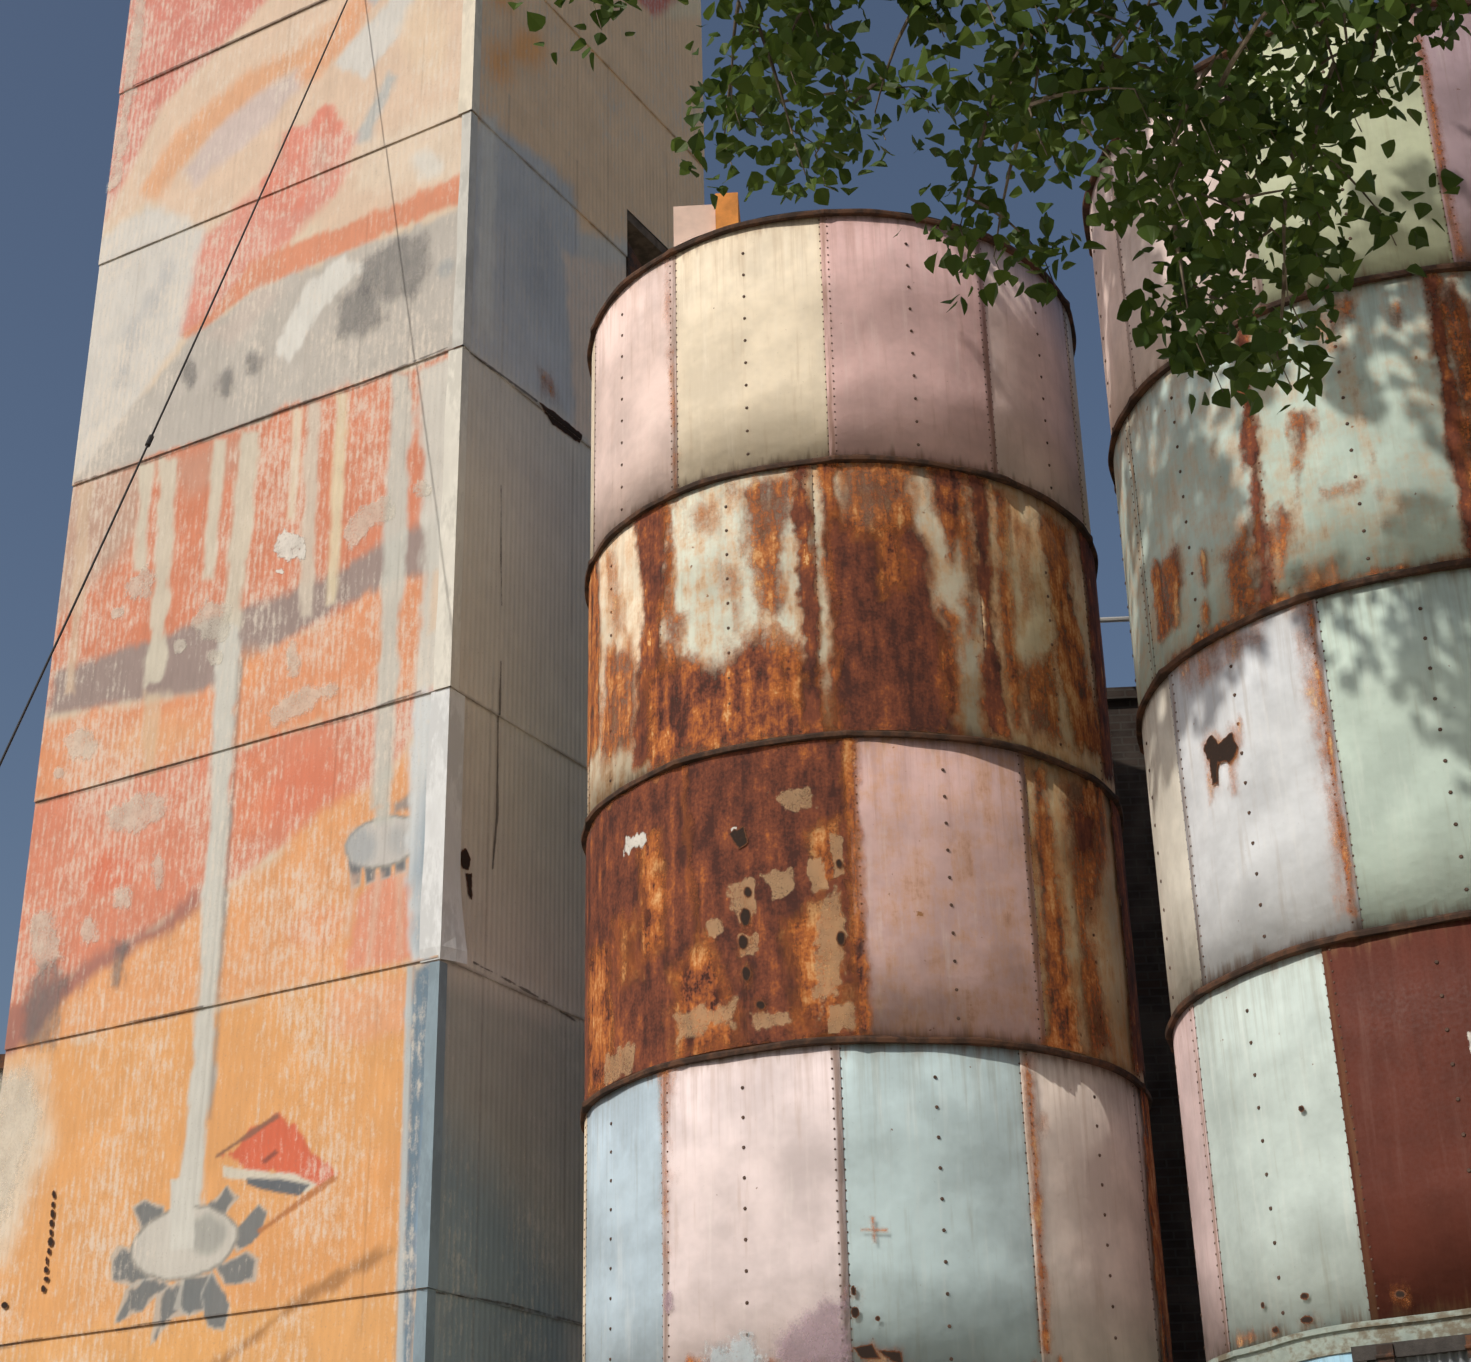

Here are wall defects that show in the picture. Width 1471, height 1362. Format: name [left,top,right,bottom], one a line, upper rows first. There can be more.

rust [1419,41,1445,170]
rust [1235,327,1250,347]
rust [1286,411,1313,468]
rust [1421,274,1471,558]
rust [1151,547,1181,642]
rust [1171,387,1290,676]
rust [1307,605,1351,909]
peeling [623,832,647,856]
rust [584,463,1173,1362]